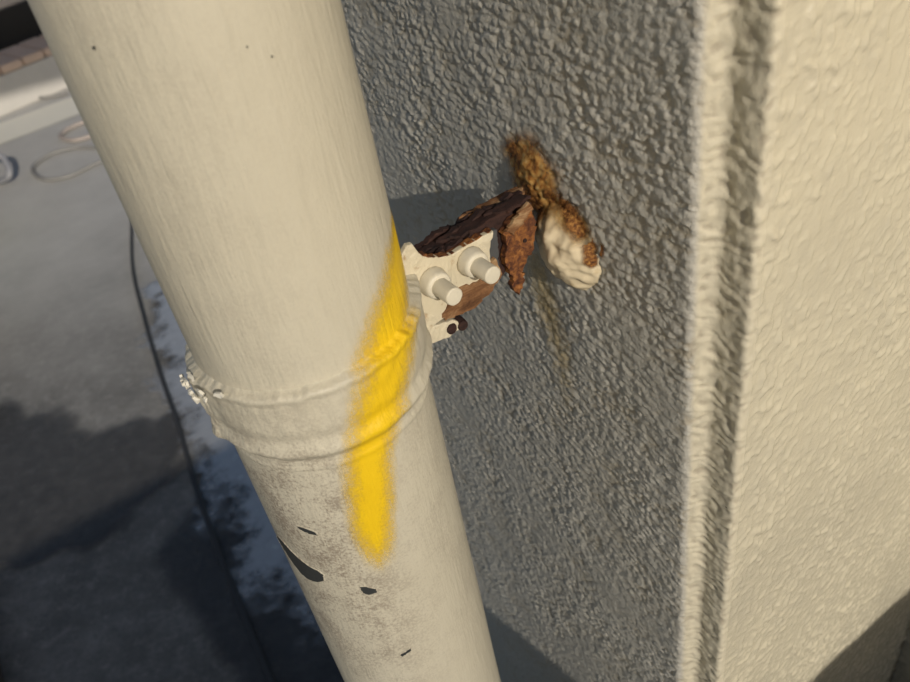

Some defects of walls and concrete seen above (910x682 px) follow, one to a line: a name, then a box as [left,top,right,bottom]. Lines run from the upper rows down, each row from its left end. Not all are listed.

corrosion [442,138,604,321]
leakage [0,405,185,566]